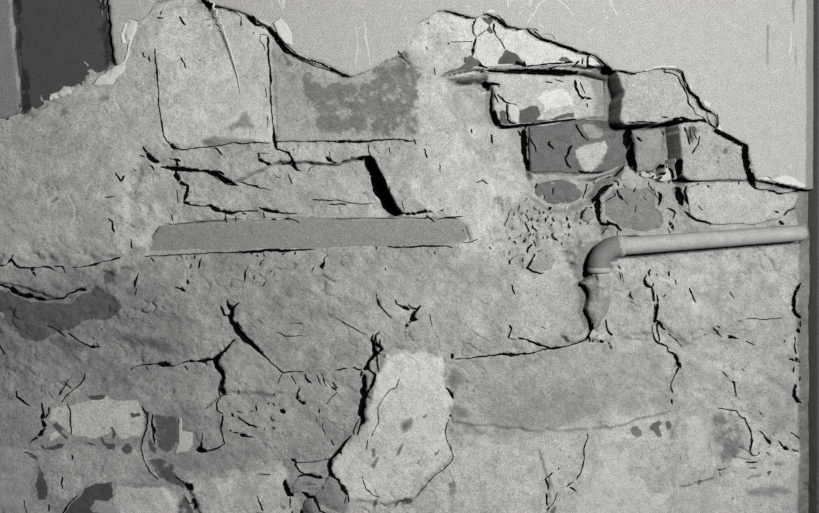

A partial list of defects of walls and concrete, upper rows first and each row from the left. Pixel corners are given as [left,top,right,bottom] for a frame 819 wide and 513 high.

crack [105,0,441,225]
flaking render [258,18,343,74]
water stain [303,52,423,135]
peeling [498,50,523,65]
peeling [500,104,574,124]
crack [448,11,802,237]
crack [0,218,328,301]
hole [504,198,571,264]
crack [451,320,613,359]
crack [618,265,697,404]
crack [131,294,433,513]
peeling [66,482,113,513]